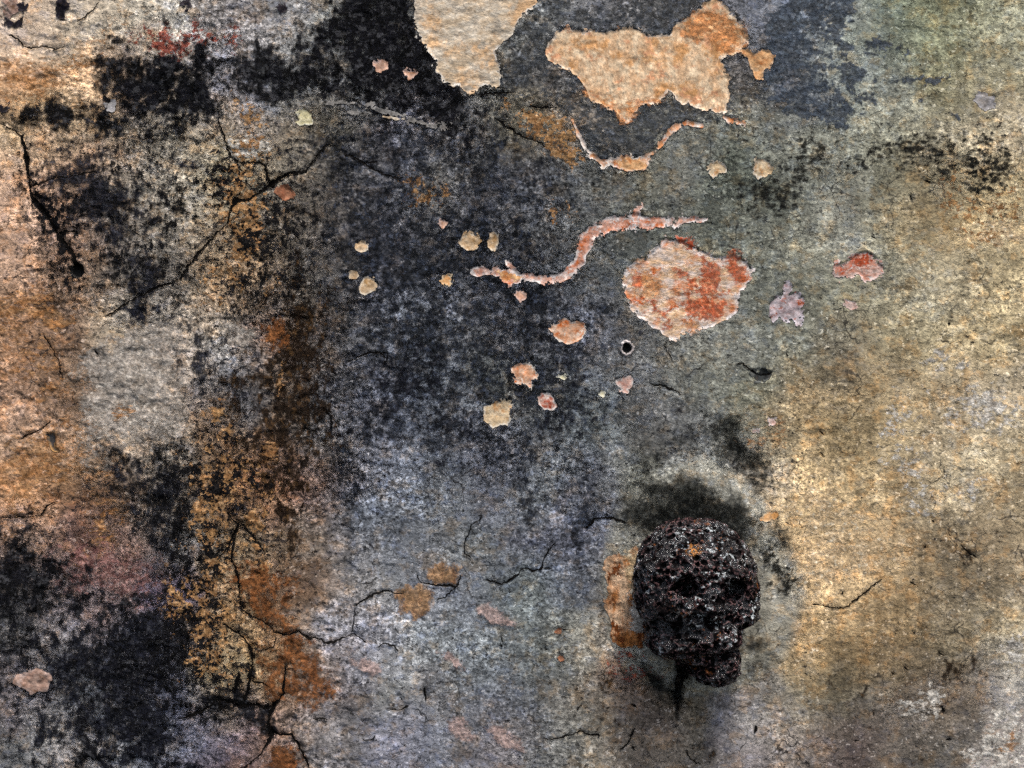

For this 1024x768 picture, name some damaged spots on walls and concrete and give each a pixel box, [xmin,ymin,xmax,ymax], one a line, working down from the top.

peeling [413,0,537,96]
peeling [545,0,776,171]
crack [2,124,97,272]
crack [105,104,403,317]
flaking render [458,231,499,252]
peeling [470,202,756,344]
damp [721,123,1024,248]
damp [0,0,632,768]
corrosion [229,560,338,713]
crack [178,512,482,768]
crack [486,543,555,585]
corrosion [267,742,304,768]